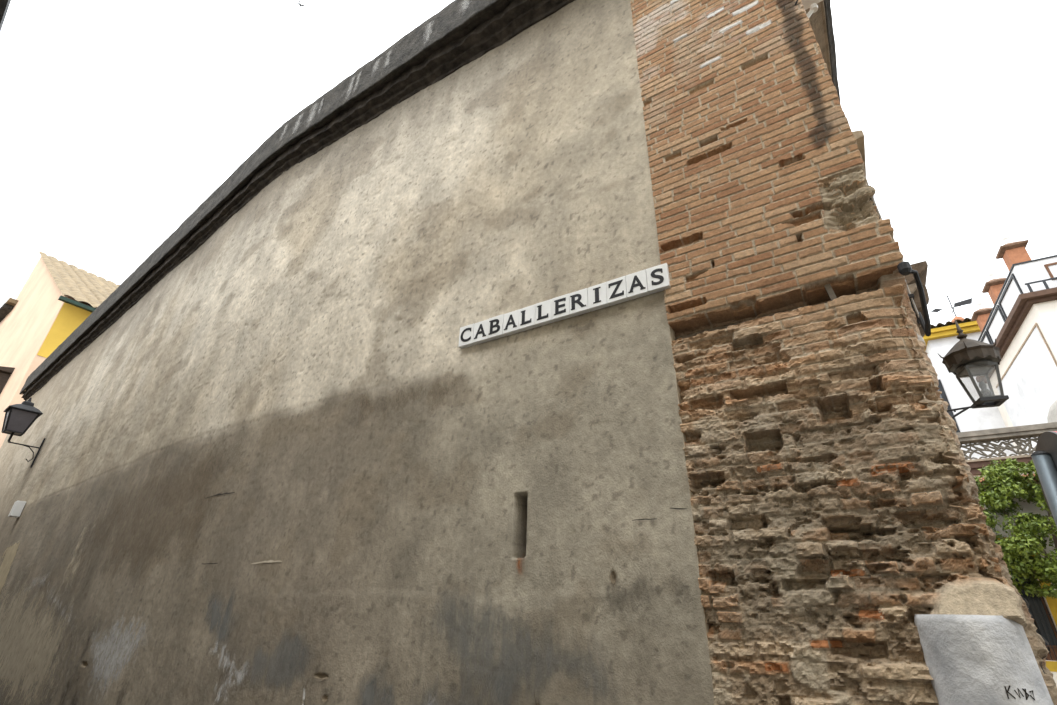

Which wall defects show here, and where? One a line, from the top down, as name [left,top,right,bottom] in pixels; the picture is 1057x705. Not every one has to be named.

spalling [820,169,878,230]